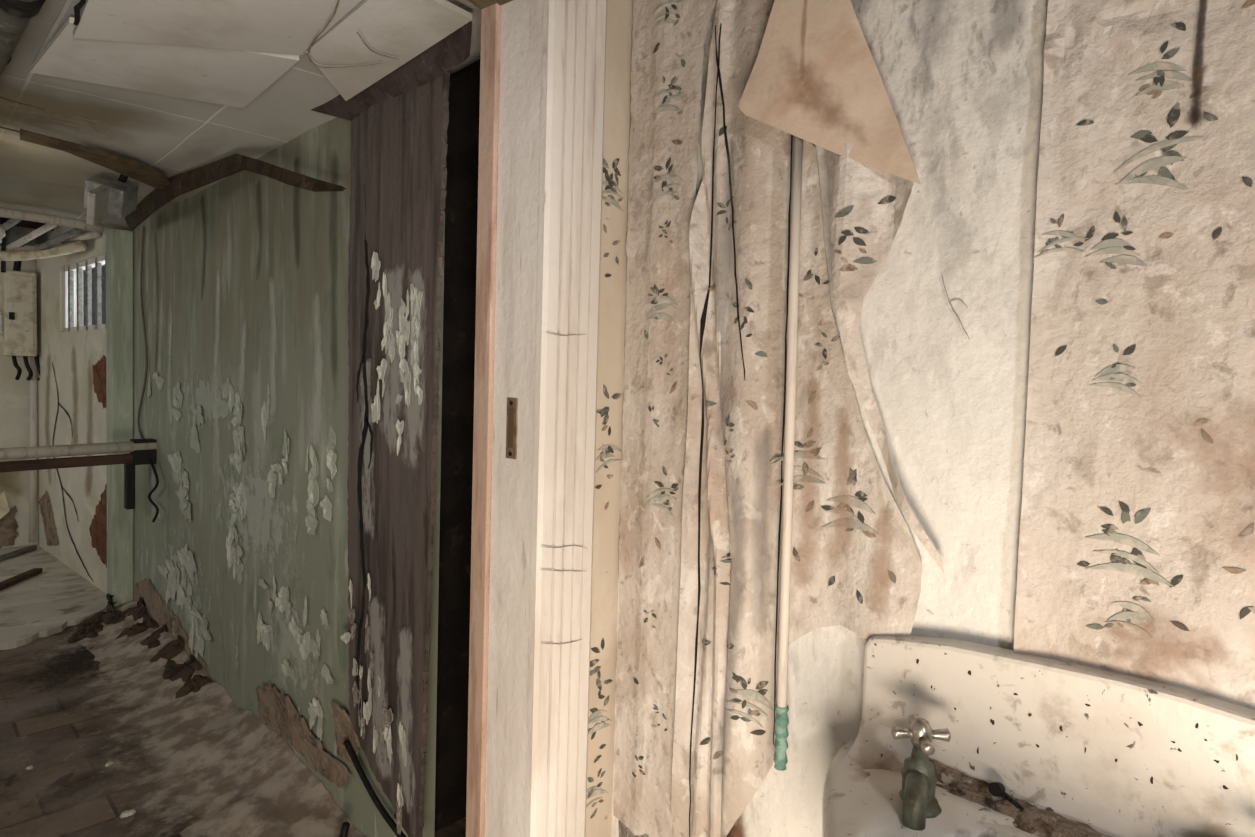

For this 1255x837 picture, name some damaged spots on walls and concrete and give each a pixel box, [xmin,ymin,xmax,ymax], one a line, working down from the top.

flaking render [92,355,106,409]
peeling [371,252,423,424]
flaking render [0,491,19,548]
peeling [147,372,246,585]
peeling [268,429,289,498]
peeling [305,425,337,535]
peeling [396,419,404,456]
peeling [133,544,212,668]
flaking render [255,573,406,789]
flaking render [619,820,649,837]